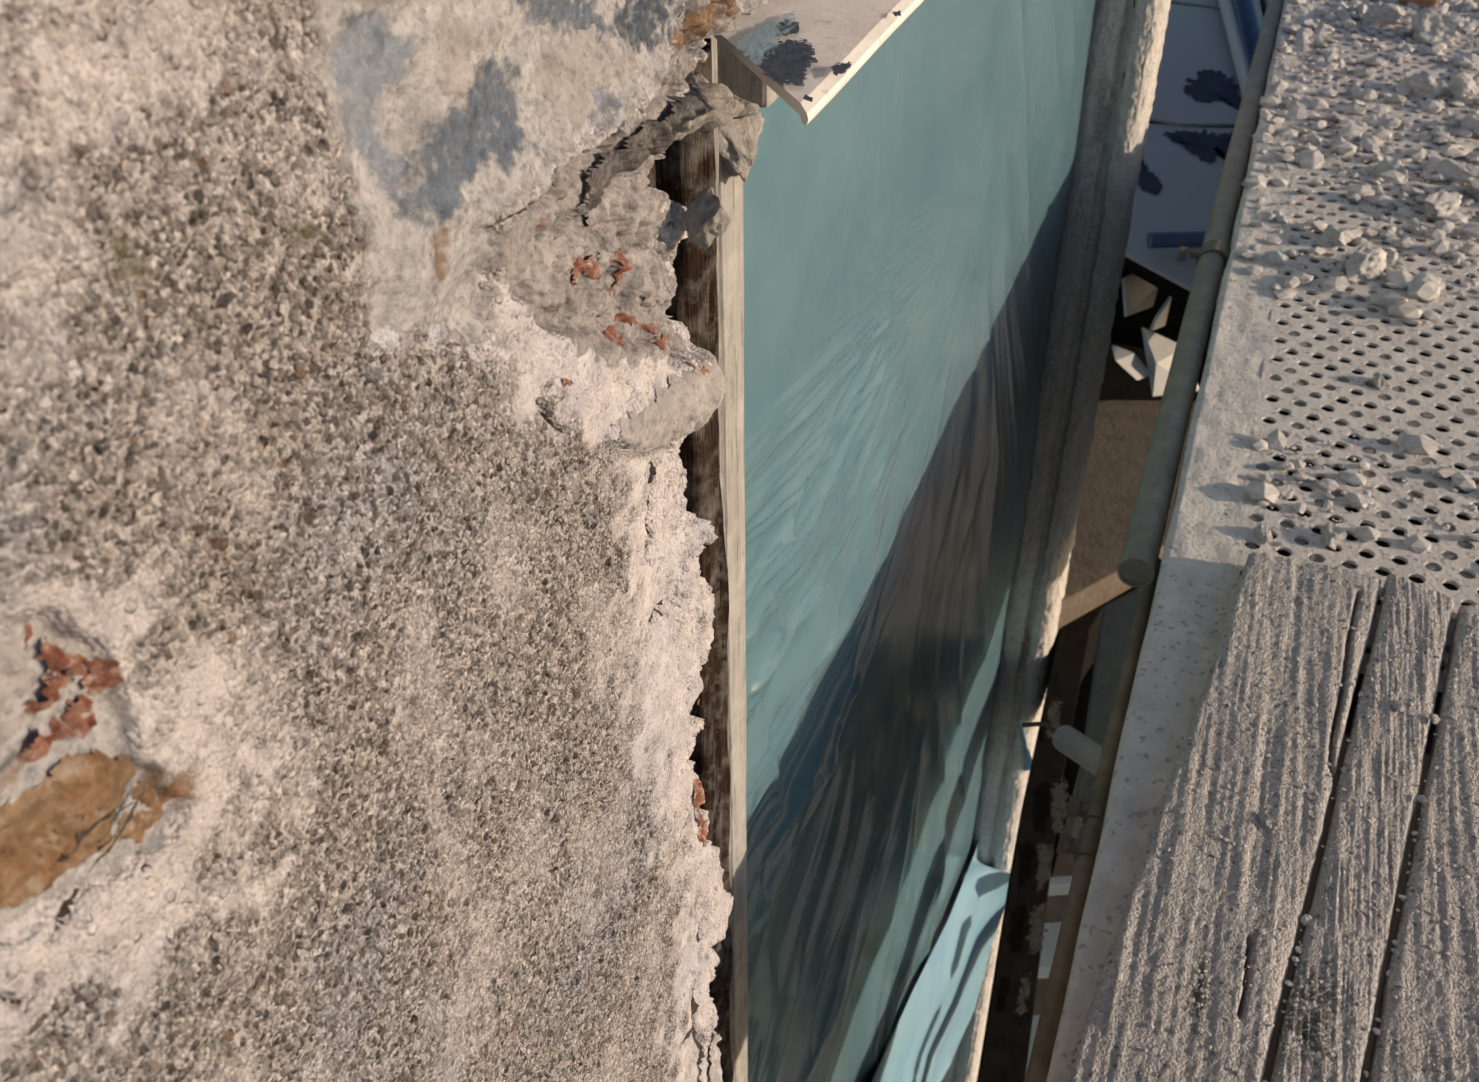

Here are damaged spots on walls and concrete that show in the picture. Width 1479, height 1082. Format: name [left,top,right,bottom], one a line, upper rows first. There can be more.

spalling [302,0,852,375]
spalling [0,615,189,928]
spalling [692,779,709,847]